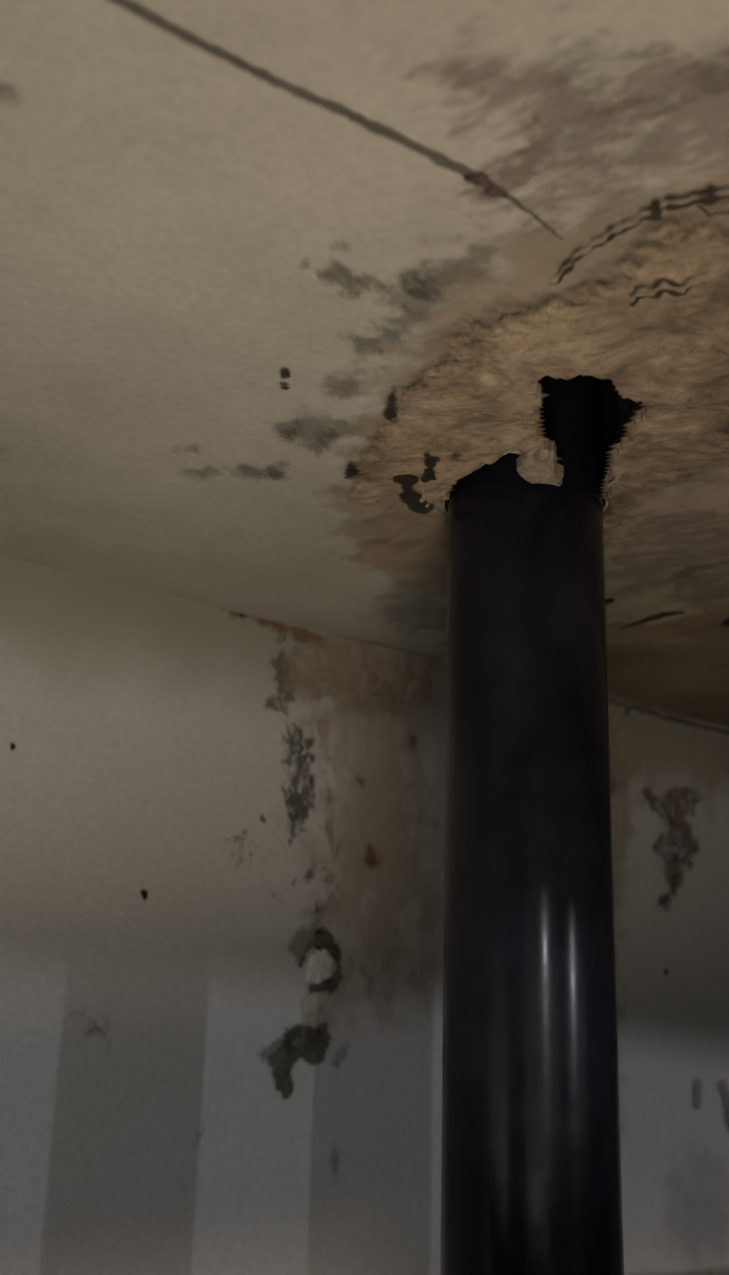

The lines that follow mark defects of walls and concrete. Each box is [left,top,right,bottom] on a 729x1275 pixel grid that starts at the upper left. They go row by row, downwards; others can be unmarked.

crack [109,0,729,285]
flaking render [344,213,729,546]
water stain [355,179,729,403]
water stain [281,674,421,969]
water stain [603,461,729,911]
spalling [263,901,347,1100]